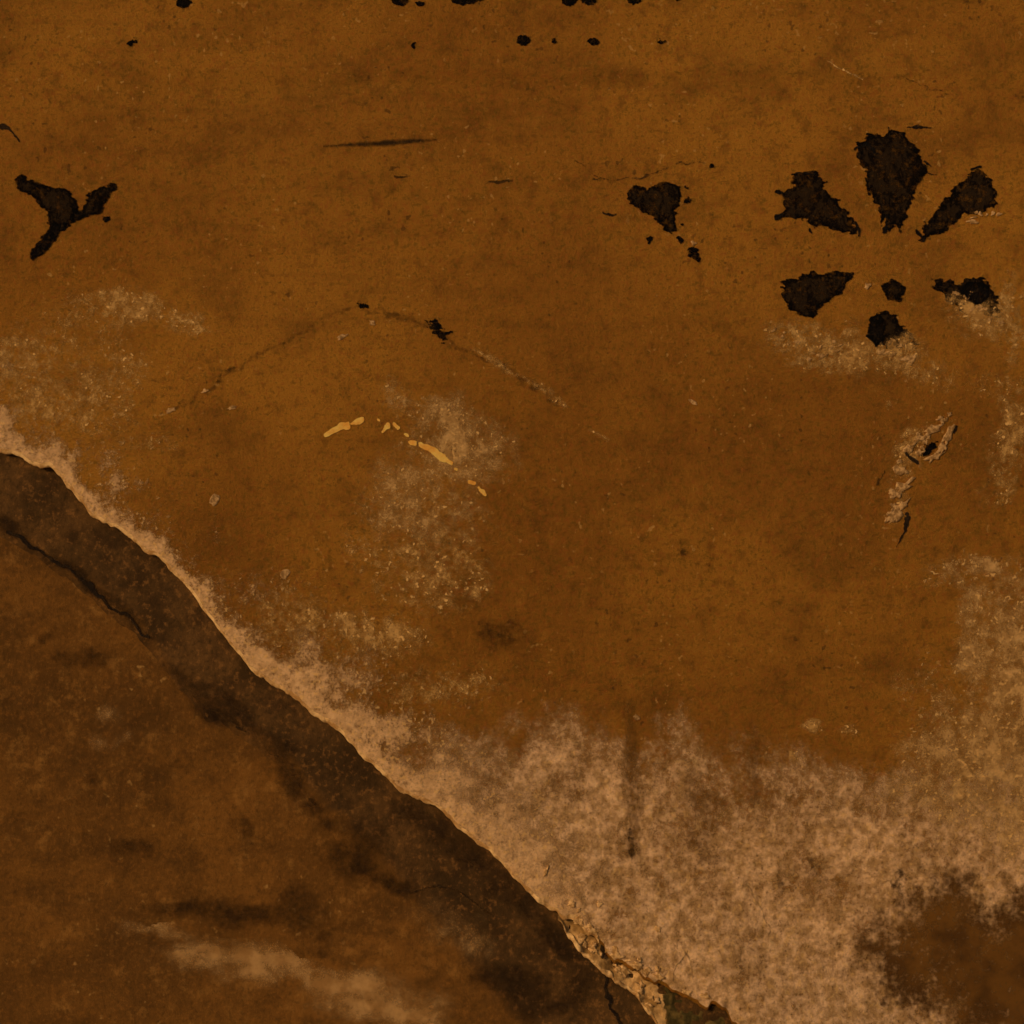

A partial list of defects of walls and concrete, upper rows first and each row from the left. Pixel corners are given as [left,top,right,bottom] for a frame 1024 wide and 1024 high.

peeling [627,182,701,262]
peeling [966,211,1003,224]
peeling [950,291,1004,324]
spalling [876,412,958,547]
crack [6,530,150,638]
efflorescence [263,588,429,657]
spalling [0,448,732,1024]
leakage [393,554,1024,1024]